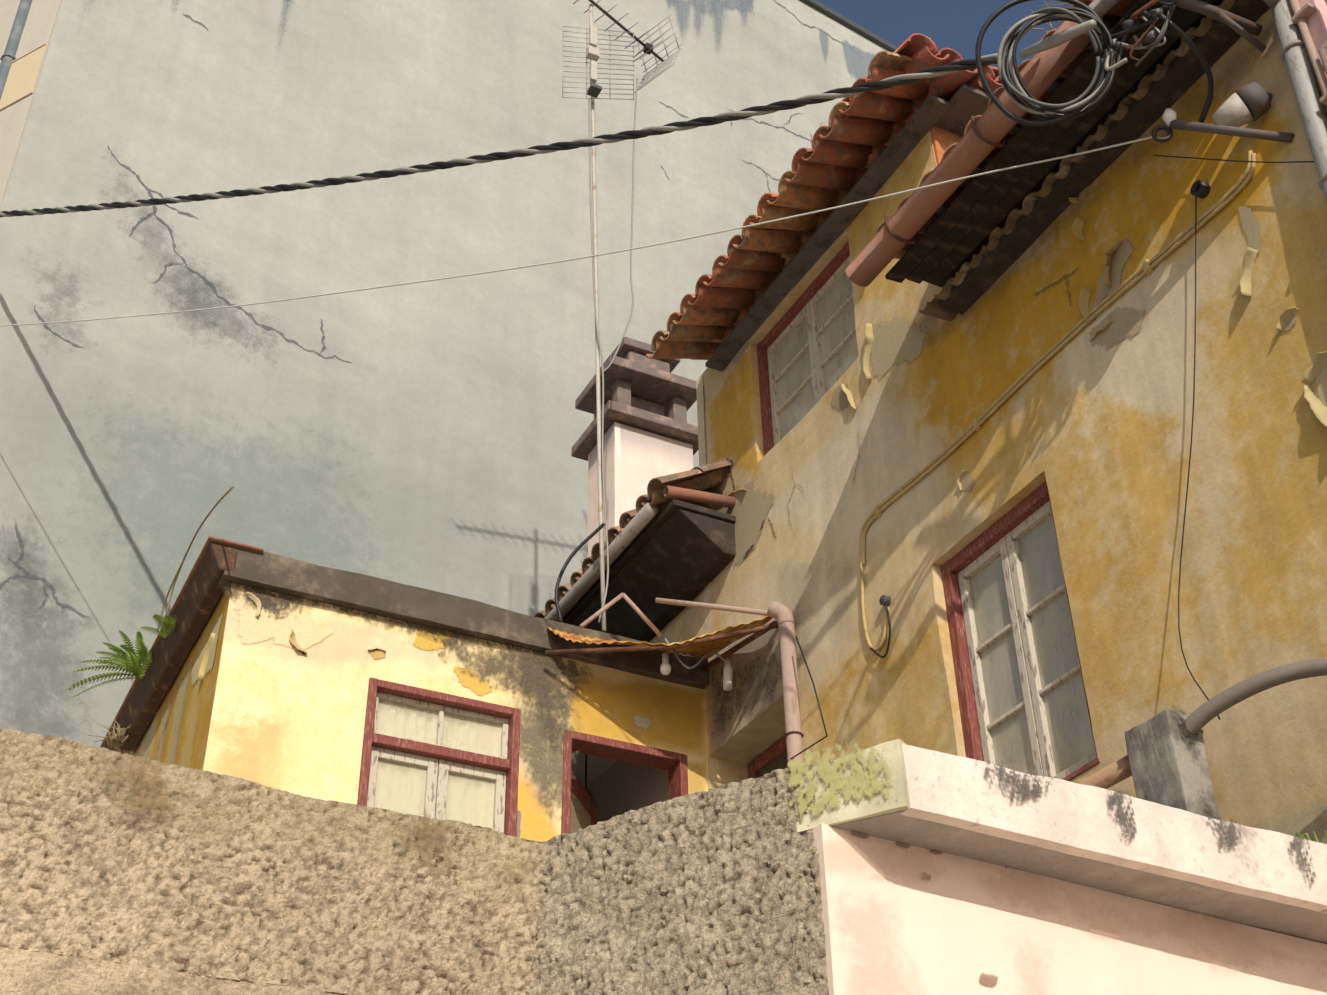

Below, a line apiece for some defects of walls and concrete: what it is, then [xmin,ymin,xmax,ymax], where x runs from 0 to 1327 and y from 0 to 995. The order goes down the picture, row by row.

water stain [820,31,874,79]
crack [726,107,811,141]
crack [743,160,780,193]
crack [108,146,351,363]
peeling [1079,239,1144,350]
peeling [1302,351,1327,427]
crack [0,518,89,617]
water stain [227,581,587,742]
peeling [413,629,452,650]
peeling [454,666,492,696]
water stain [1108,789,1137,842]
water stain [1289,834,1316,884]